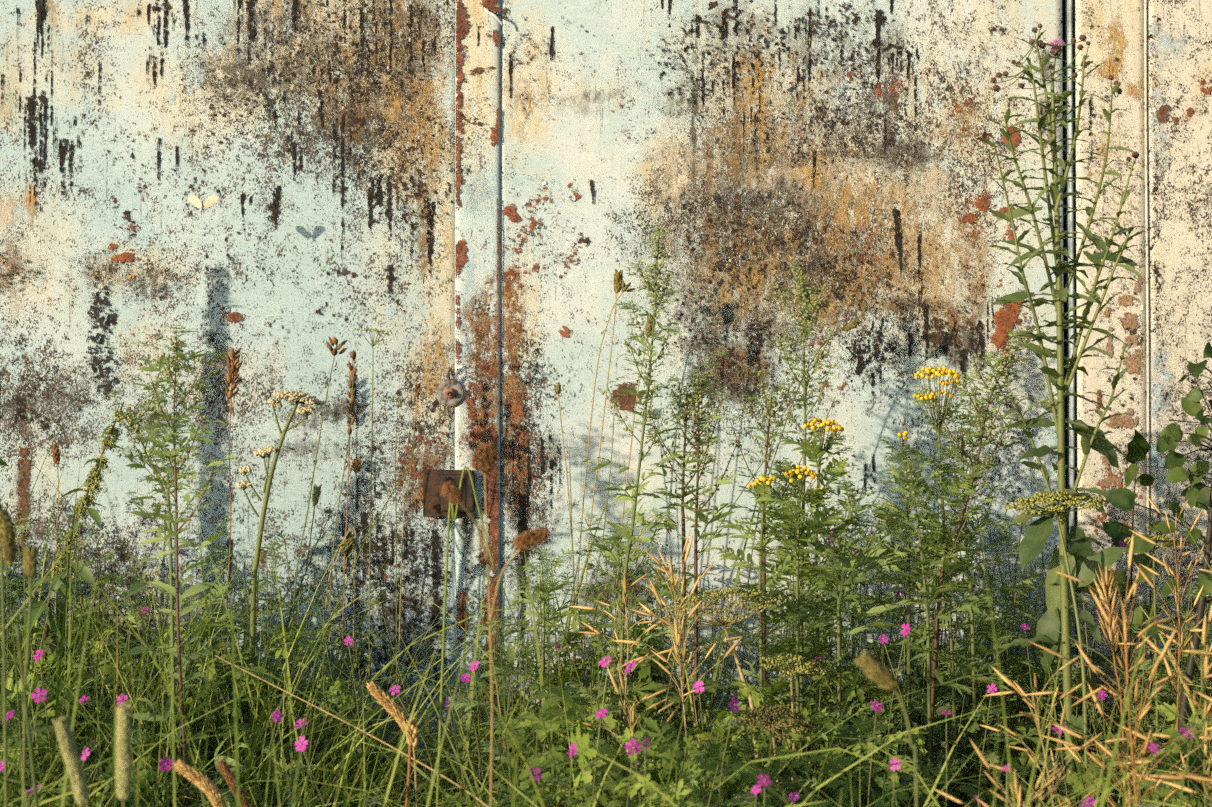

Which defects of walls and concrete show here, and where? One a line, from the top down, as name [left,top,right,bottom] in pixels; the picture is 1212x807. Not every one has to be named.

leakage [0,0,83,218]
leakage [240,193,252,232]
leakage [233,0,266,64]
leakage [266,90,308,230]
leakage [284,0,300,30]
leakage [317,0,448,259]
leakage [363,174,451,280]
corrosion [385,0,500,208]
leakage [640,0,1010,409]
corrosion [722,71,1035,404]
corrosion [375,199,579,720]